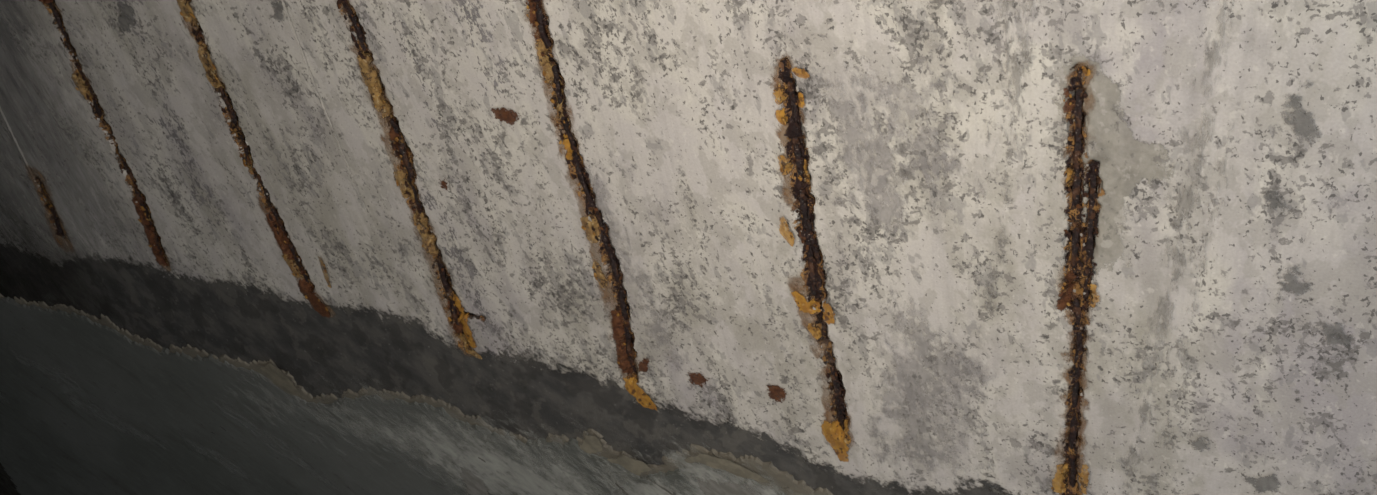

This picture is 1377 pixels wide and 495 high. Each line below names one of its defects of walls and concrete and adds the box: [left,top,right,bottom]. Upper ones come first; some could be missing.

corrosion [38,0,171,271]
corrosion [177,0,335,318]
corrosion [339,0,485,359]
peeling [0,294,833,495]
corrosion [491,105,520,126]
corrosion [525,0,657,410]
corrosion [766,385,787,403]
corrosion [773,57,853,462]
corrosion [1051,63,1105,495]